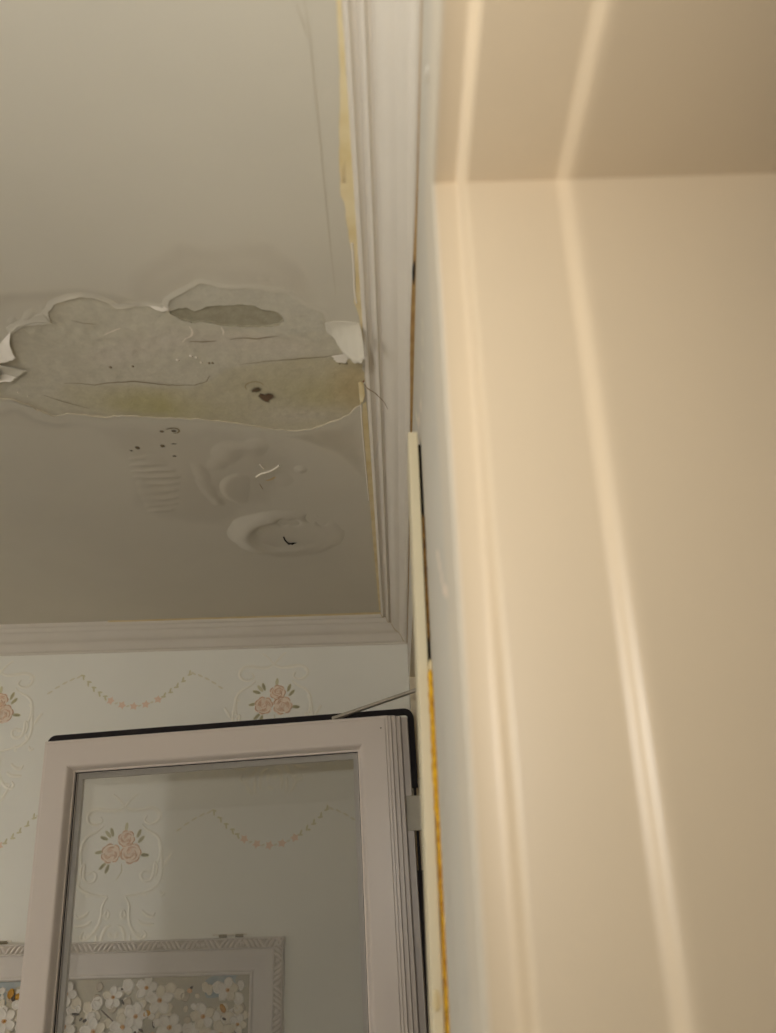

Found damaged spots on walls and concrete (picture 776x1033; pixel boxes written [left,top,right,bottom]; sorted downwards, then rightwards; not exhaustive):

peeling [0,279,367,434]